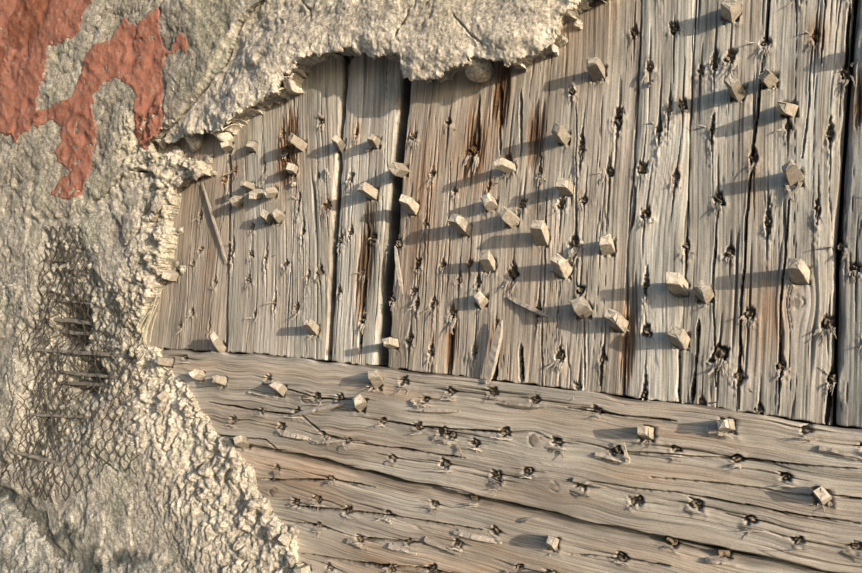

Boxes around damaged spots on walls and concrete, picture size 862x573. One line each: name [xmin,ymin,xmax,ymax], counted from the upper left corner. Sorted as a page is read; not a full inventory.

peeling [0,0,188,200]
flaking render [0,224,143,482]